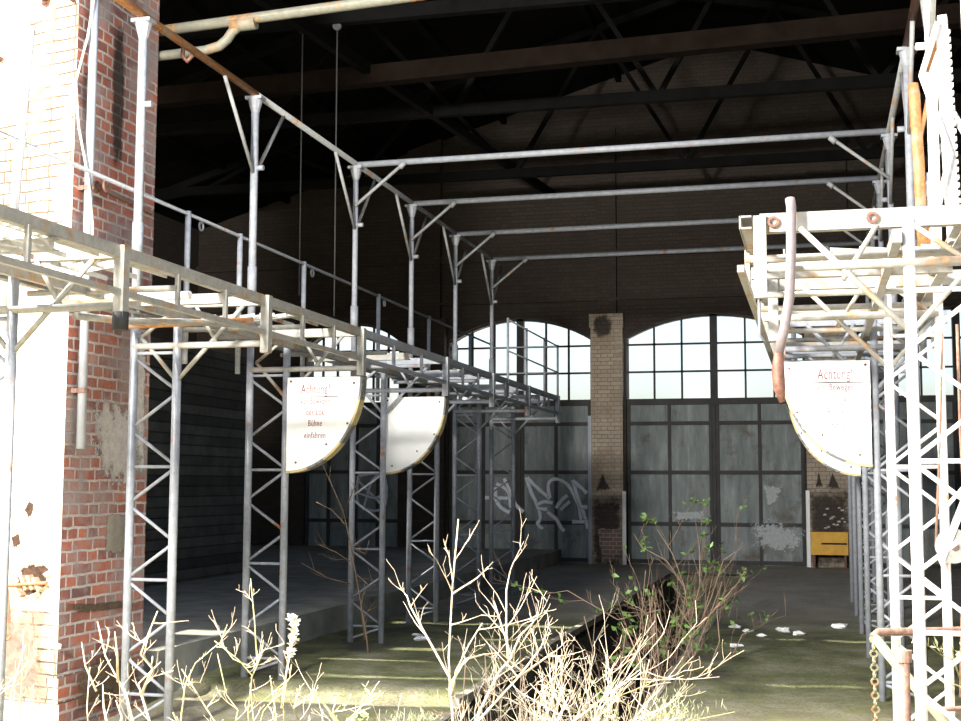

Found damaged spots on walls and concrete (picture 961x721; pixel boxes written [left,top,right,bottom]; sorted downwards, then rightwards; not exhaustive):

spalling [10,559,52,599]